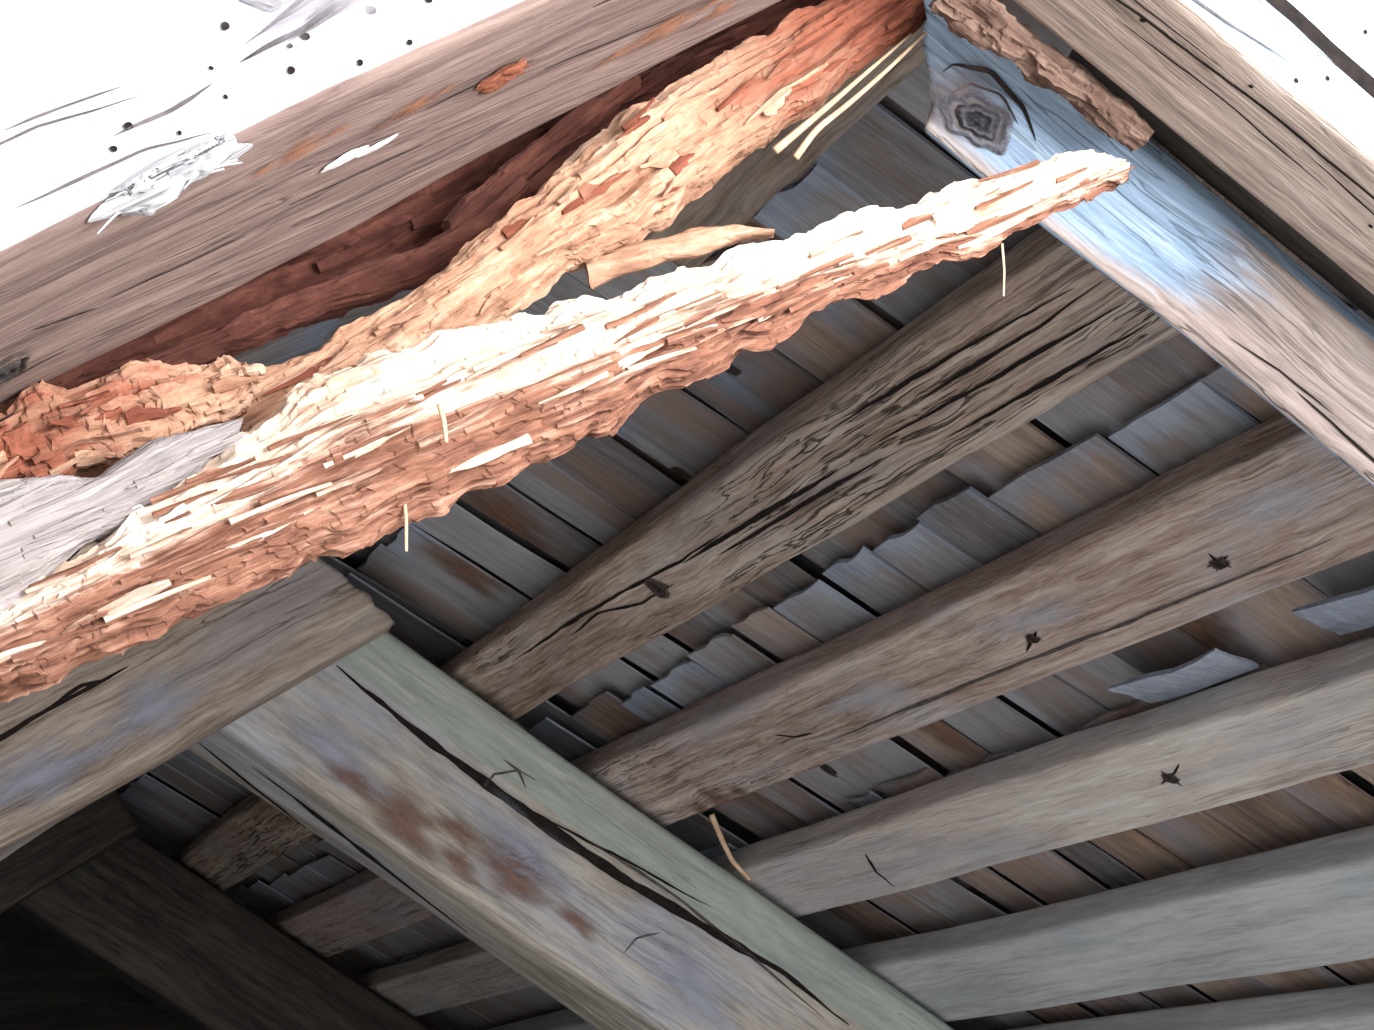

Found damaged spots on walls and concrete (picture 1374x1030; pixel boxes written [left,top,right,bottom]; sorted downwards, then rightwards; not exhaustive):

spalling [88,126,253,234]
peeling [321,134,398,173]
spalling [476,55,531,94]
peeling [454,88,612,171]
peeling [554,0,824,215]
peeling [0,157,1135,663]
crack [512,281,1152,663]
crack [0,666,128,742]
rust [336,769,364,793]
rust [378,794,541,899]
crack [336,665,849,1025]
rust [564,912,588,935]